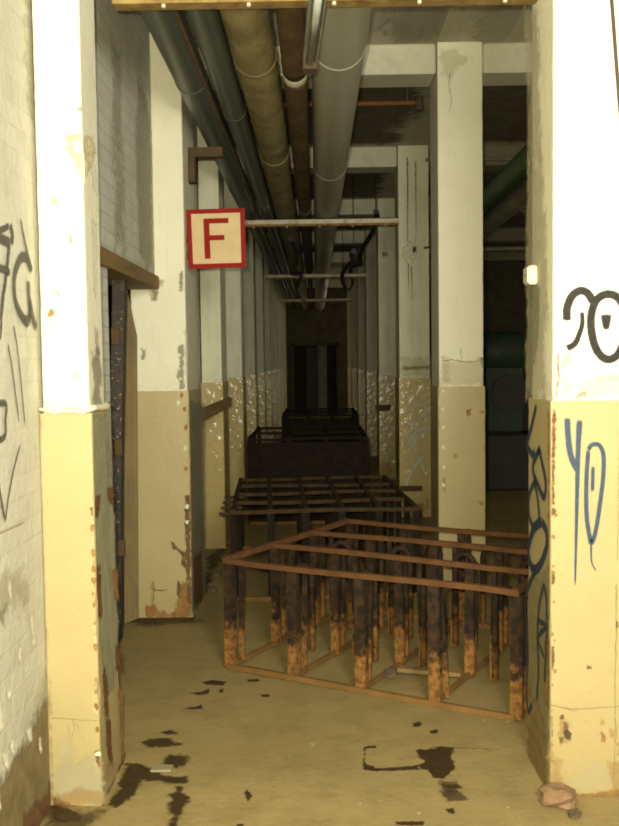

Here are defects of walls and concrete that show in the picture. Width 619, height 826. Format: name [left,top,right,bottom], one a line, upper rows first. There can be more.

spalling [171,495,192,603]